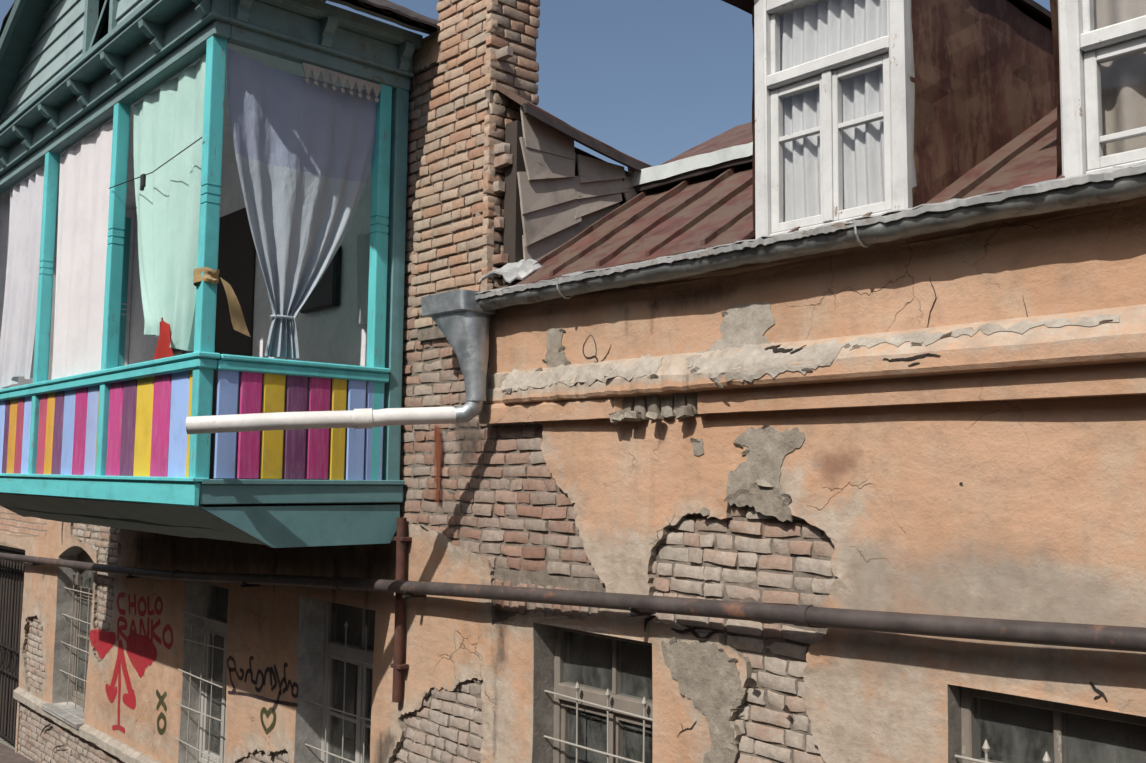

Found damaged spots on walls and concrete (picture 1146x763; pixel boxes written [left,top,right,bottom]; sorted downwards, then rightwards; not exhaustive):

spalling [402,63,466,408]
spalling [476,142,513,229]
flaking render [501,326,663,394]
crack [883,277,940,366]
spalling [369,414,606,592]
spalling [652,425,838,607]
spalling [73,523,121,632]
spalling [493,600,602,623]
flaking render [18,616,125,763]
spalling [238,747,290,763]
spalling [393,678,484,763]
spalling [656,613,828,763]